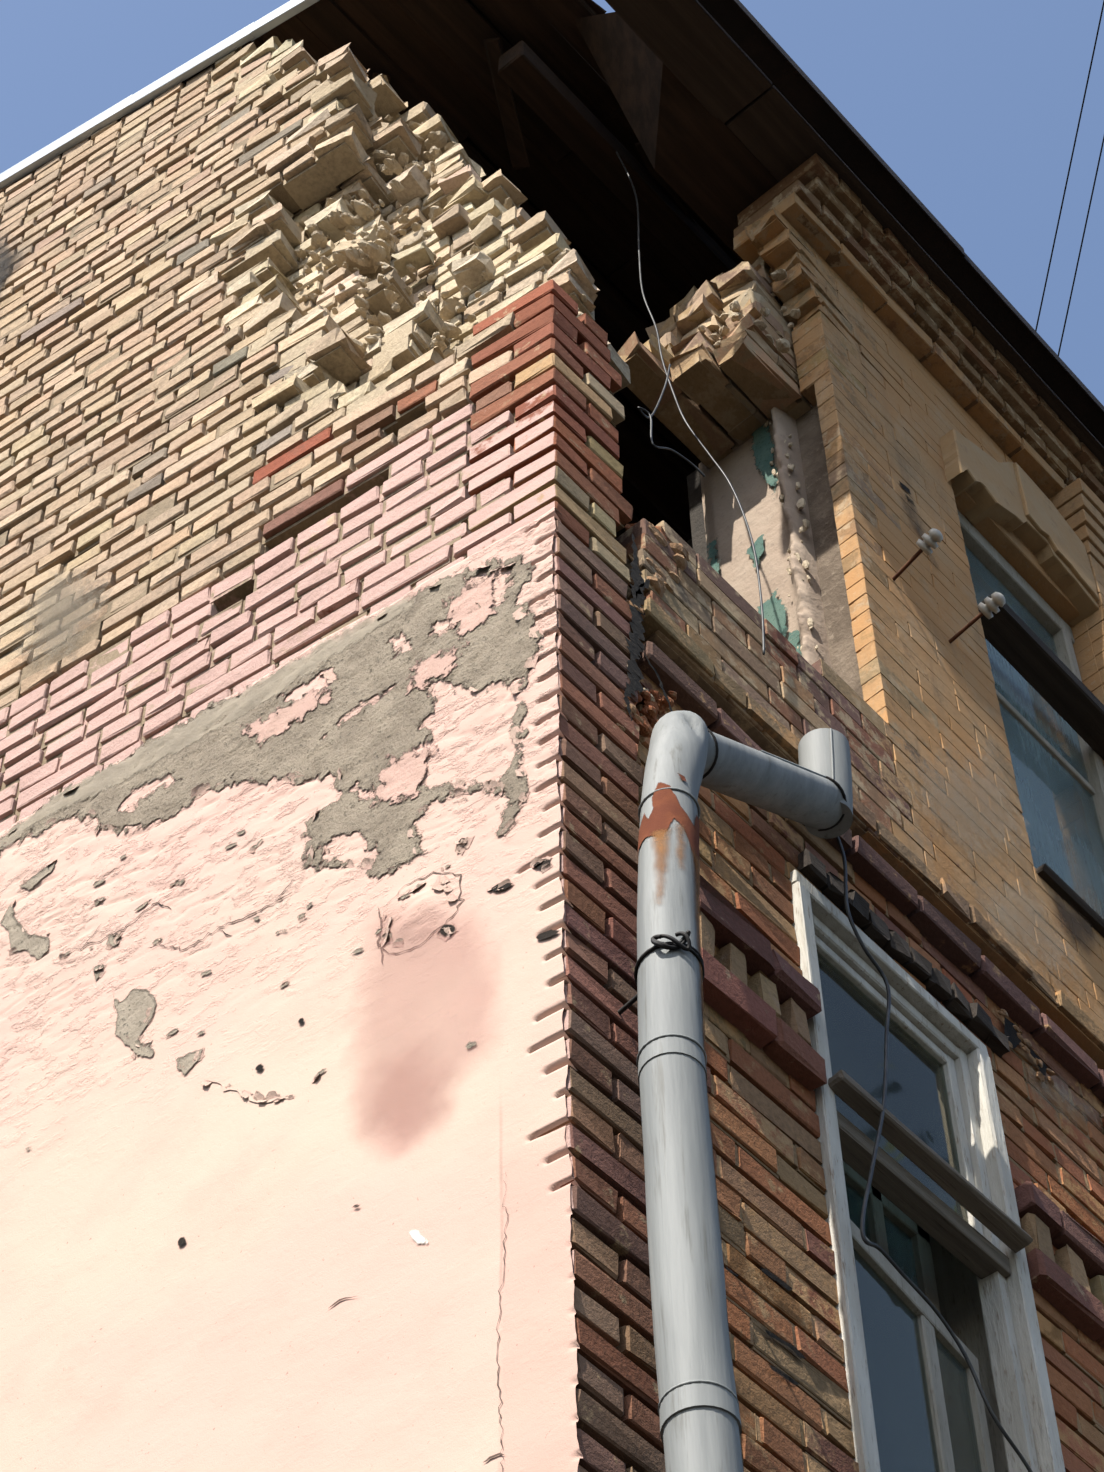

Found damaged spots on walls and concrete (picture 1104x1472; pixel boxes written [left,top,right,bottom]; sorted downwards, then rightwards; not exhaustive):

spalling [293,115,514,359]
spalling [553,248,571,265]
spalling [698,268,801,353]
peeling [707,539,722,573]
peeling [746,534,764,568]
peeling [751,418,811,585]
peeling [757,589,819,656]
peeling [0,552,544,878]
peeling [0,859,70,960]
peeling [89,932,123,980]
peeling [113,988,295,1104]
crack [484,1172,508,1472]